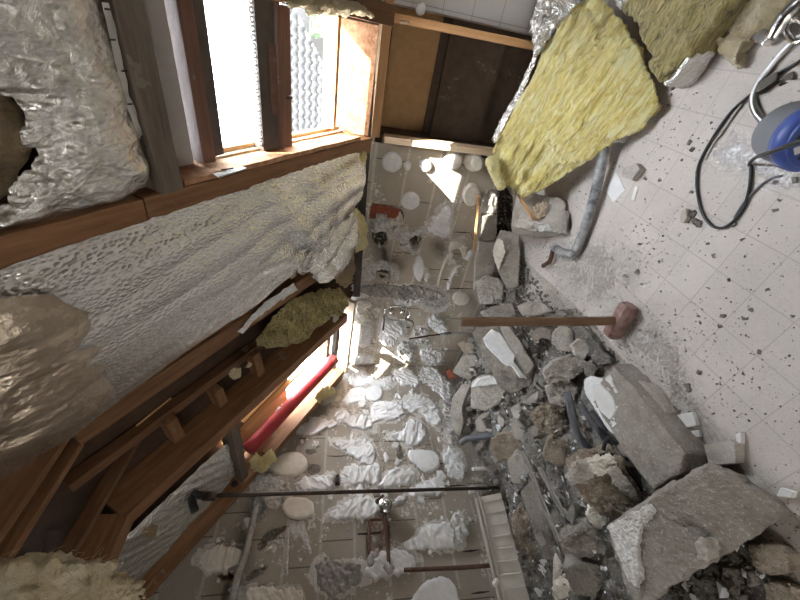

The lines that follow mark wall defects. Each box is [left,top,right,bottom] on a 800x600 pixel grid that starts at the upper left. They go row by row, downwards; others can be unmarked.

spalling [369,204,400,248]
spalling [480,188,513,238]
peeling [372,430,418,474]